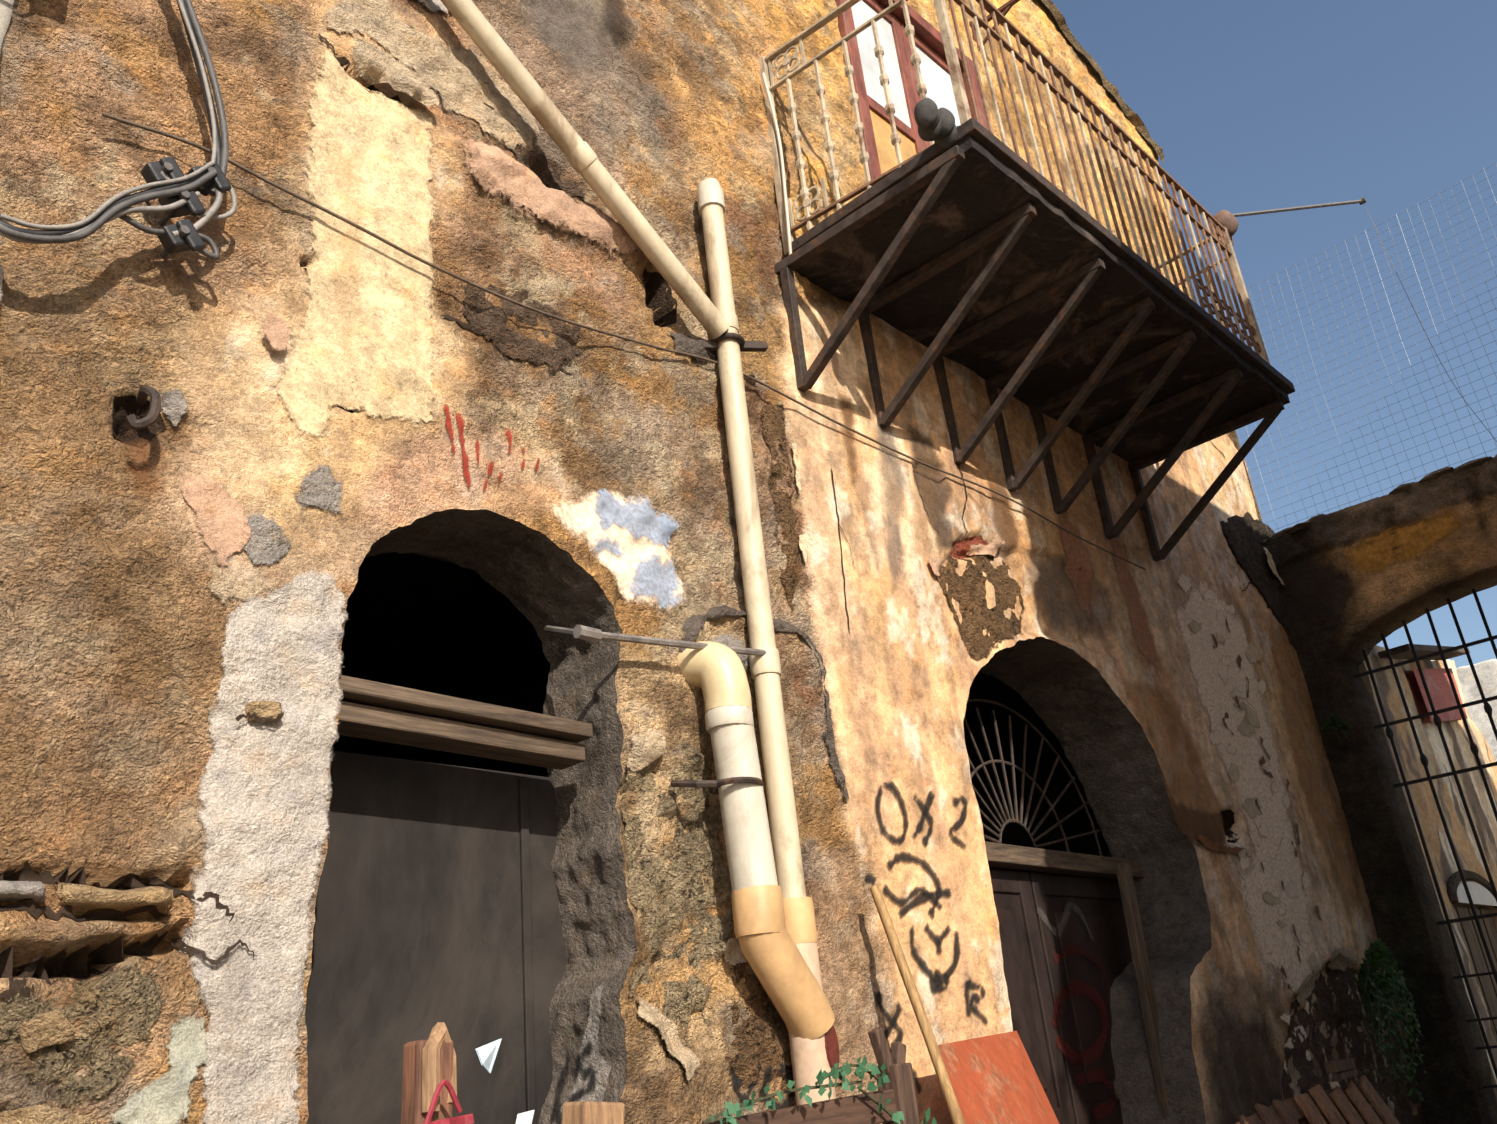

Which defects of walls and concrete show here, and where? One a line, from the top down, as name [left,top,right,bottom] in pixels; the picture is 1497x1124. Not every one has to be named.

water stain [607,0,626,38]
peeling [262,0,585,439]
peeling [554,489,683,608]
flaking render [929,536,1025,662]
peeling [245,701,283,722]
peeling [1176,573,1426,1124]
crack [0,858,257,1001]